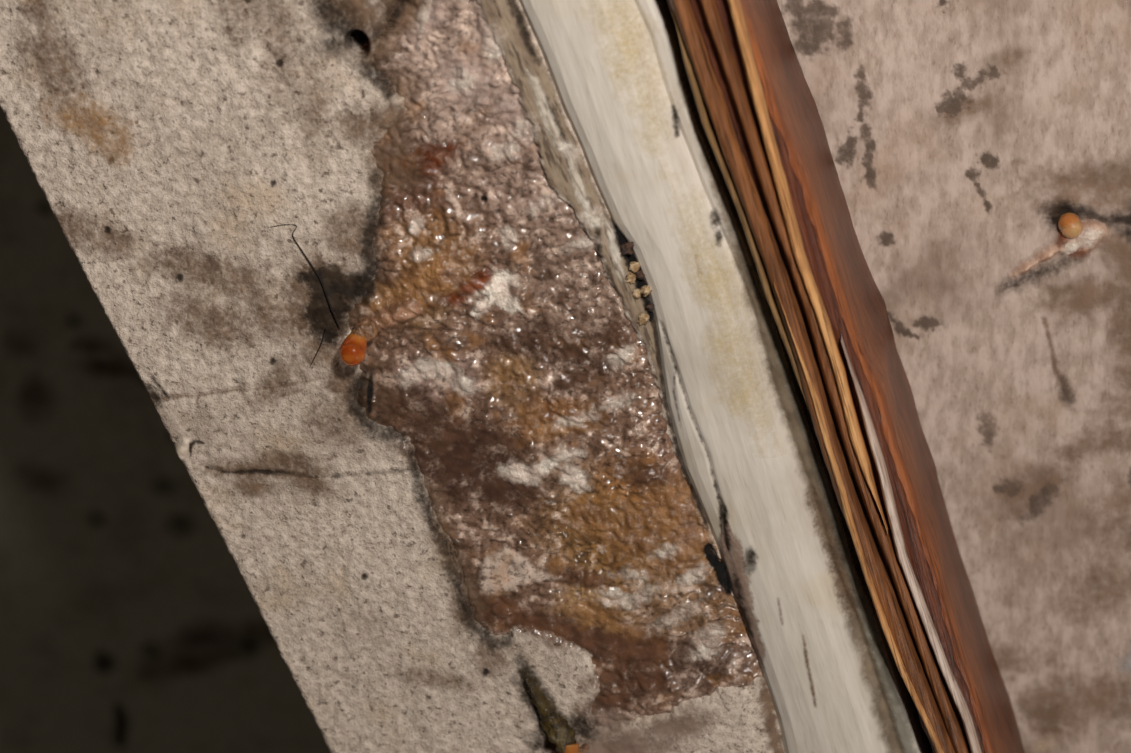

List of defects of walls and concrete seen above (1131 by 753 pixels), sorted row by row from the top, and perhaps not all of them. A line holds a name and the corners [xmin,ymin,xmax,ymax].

water stain [318,0,426,32]
water stain [720,505,730,548]
water stain [746,550,756,571]
water stain [735,579,752,634]